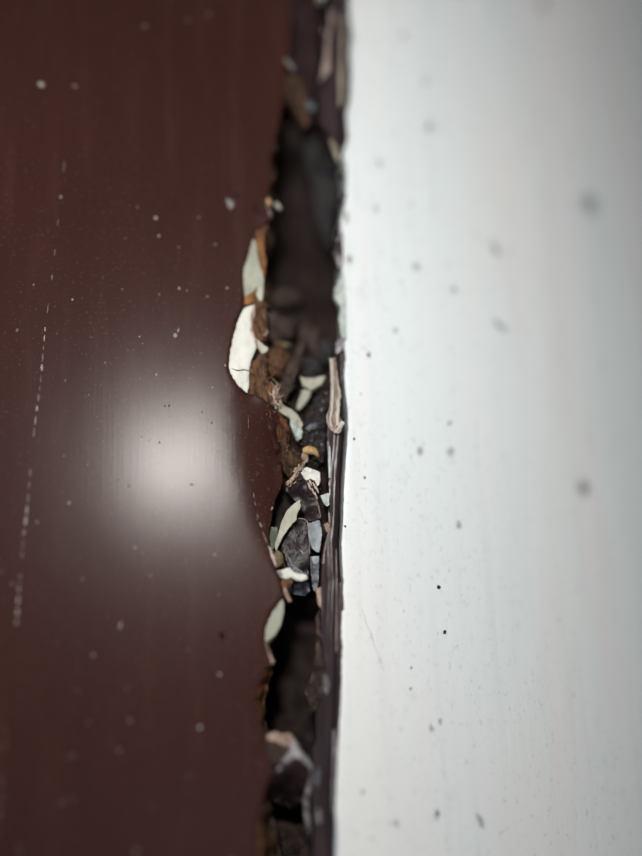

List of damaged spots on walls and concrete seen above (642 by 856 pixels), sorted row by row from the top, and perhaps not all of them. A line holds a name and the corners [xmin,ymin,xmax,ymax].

peeling [317,0,333,83]
peeling [259,198,281,222]
peeling [229,239,268,393]
peeling [332,225,347,355]
peeling [266,390,311,463]
peeling [300,453,329,507]
peeling [268,500,301,551]
peeling [277,556,319,582]
peeling [265,599,284,665]
peeling [322,674,330,694]